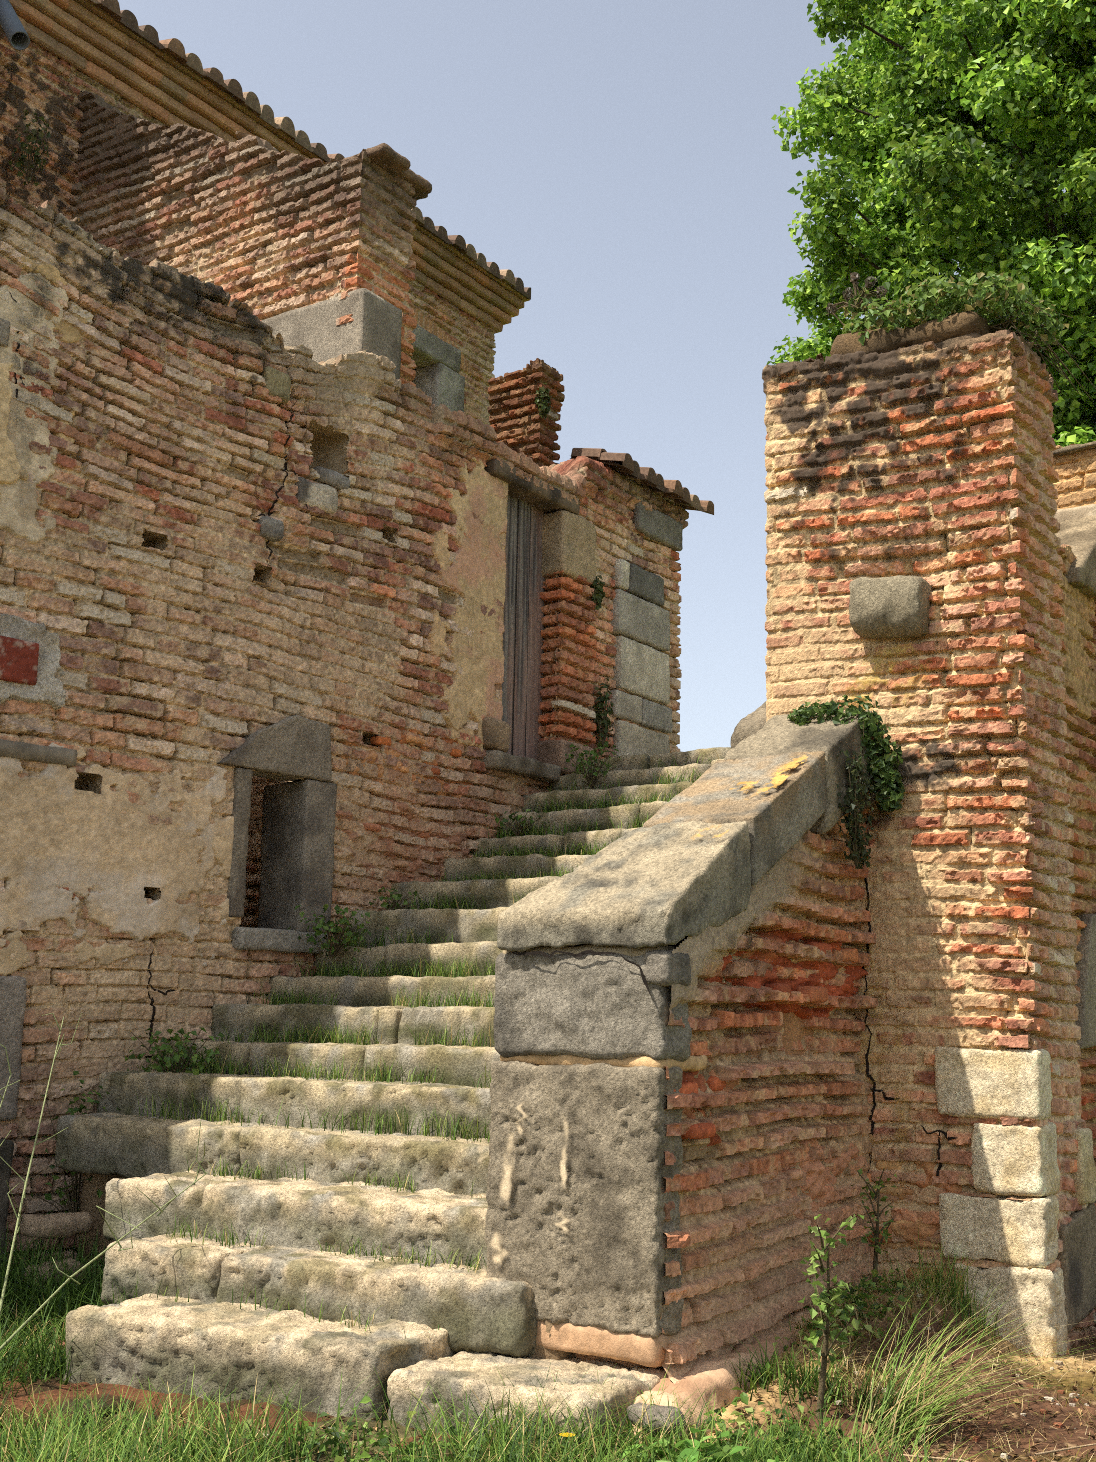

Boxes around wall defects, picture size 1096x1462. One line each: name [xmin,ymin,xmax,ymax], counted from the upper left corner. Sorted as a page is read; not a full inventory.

flaking render [0,256,87,544]
leakage [791,411,828,487]
flaking render [335,449,508,889]
flaking render [0,742,237,976]
crack [147,949,176,1049]
crack [862,813,957,1198]